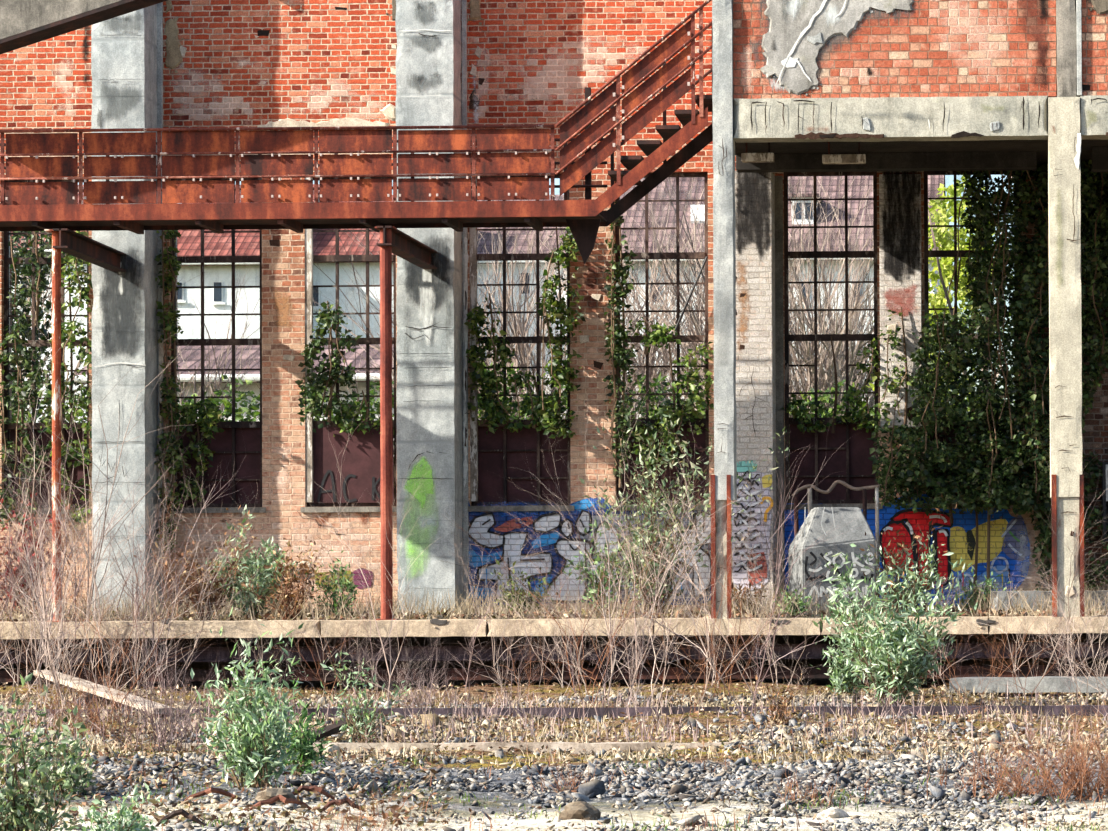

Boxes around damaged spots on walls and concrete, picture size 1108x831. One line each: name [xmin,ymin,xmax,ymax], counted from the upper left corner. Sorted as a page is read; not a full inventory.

water stain [415,2,433,22]
peeling [1087,0,1108,20]
water stain [413,36,441,51]
peeling [760,0,915,96]
water stain [53,63,88,116]
water stain [410,73,439,89]
water stain [97,85,137,127]
spalling [795,116,884,139]
spalling [951,121,1000,138]
water stain [100,249,141,356]